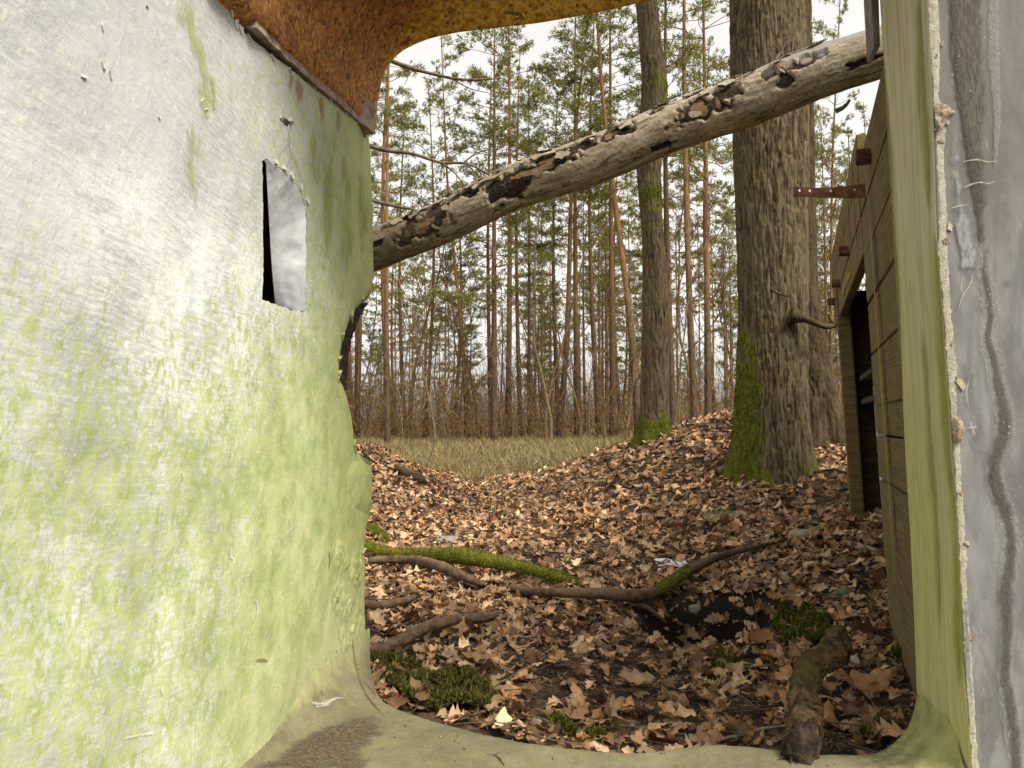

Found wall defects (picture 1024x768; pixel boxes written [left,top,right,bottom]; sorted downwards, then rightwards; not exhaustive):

peeling [928,0,979,768]
water stain [950,0,1021,768]